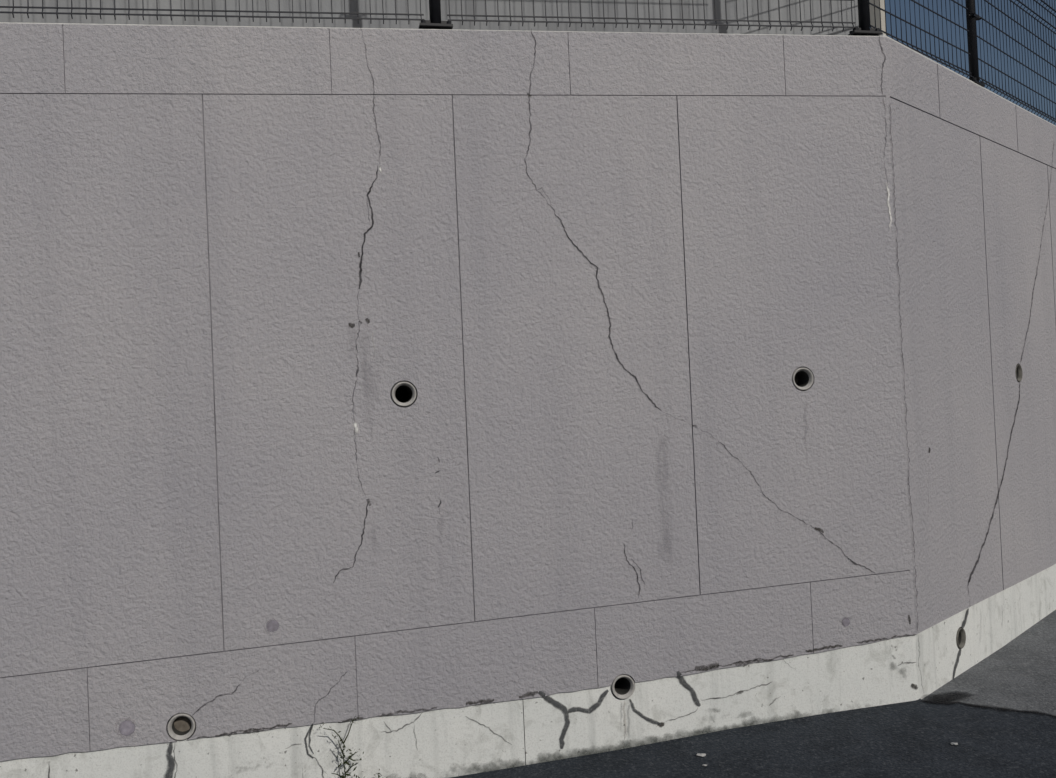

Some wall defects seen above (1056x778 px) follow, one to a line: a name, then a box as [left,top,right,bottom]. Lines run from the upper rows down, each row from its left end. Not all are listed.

crack [348,77,381,383]
crack [553,209,659,409]
crack [886,184,907,412]
crack [333,499,369,583]
crack [624,545,644,593]
crack [953,225,1044,679]
crack [294,723,323,776]
crack [629,699,664,727]